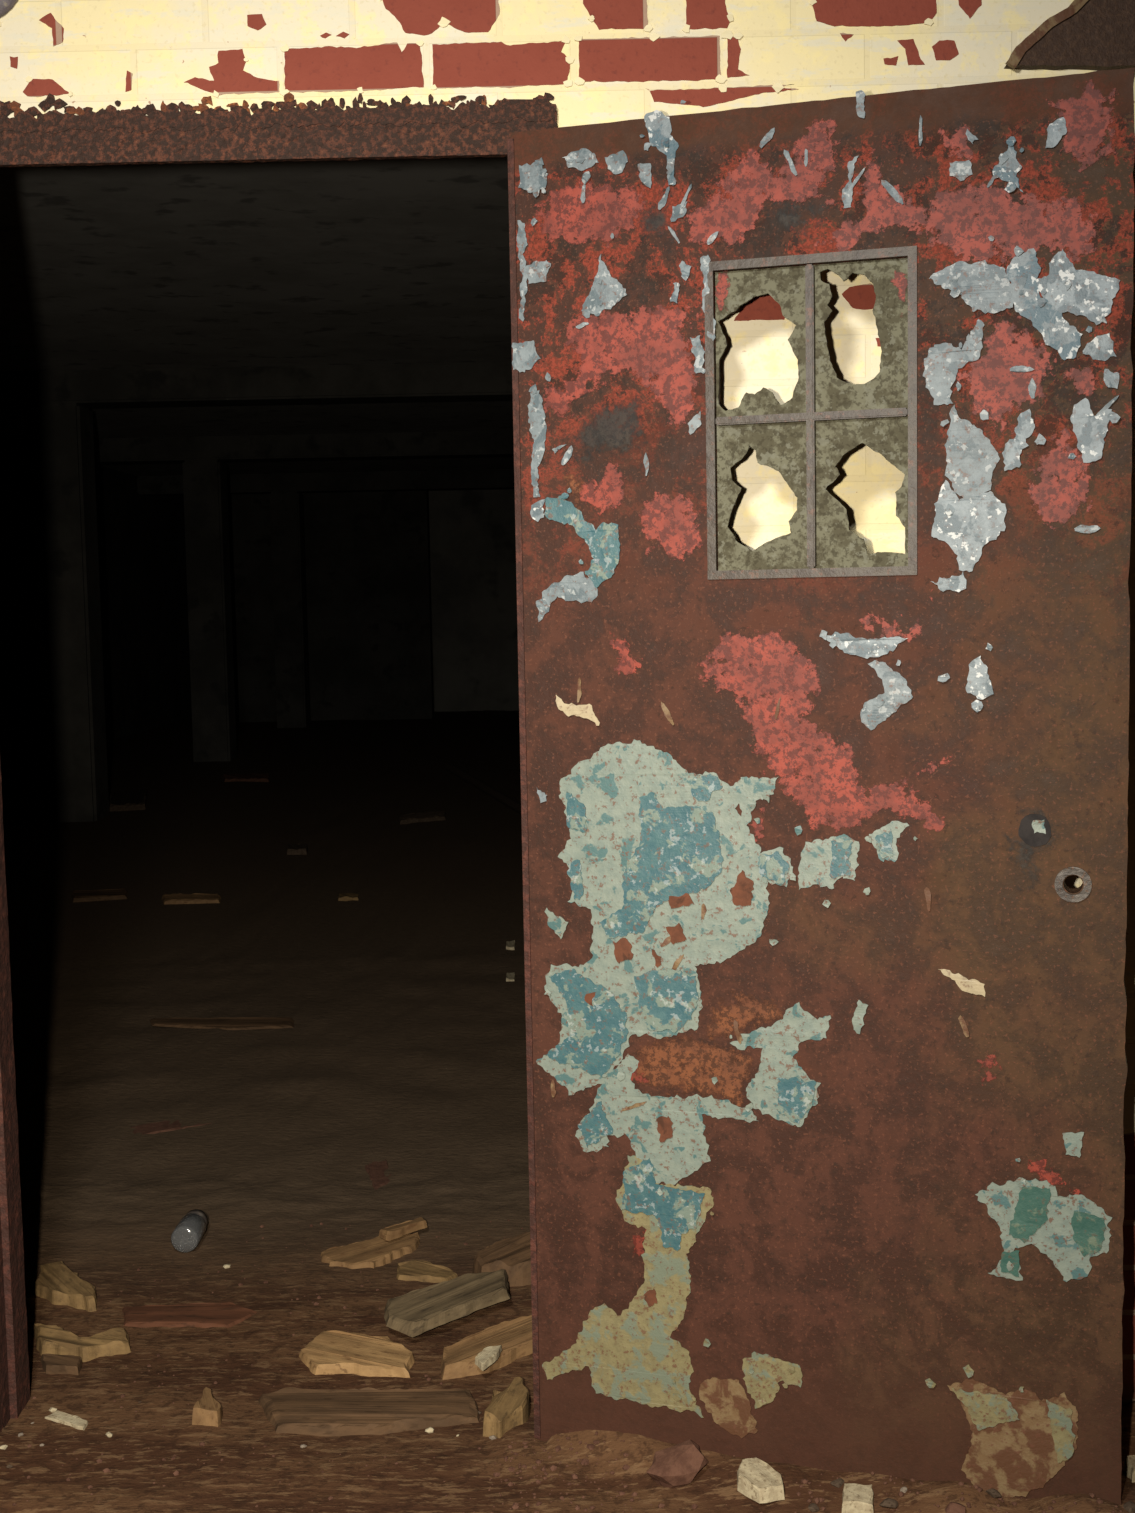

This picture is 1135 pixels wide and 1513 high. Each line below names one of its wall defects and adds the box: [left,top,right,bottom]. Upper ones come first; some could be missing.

peeling [809,0,959,66]
corrosion [0,92,507,117]
peeling [184,0,798,243]
peeling [576,255,627,329]
peeling [512,340,621,622]
peeling [923,246,1120,592]
peeling [820,630,913,730]
corrosion [634,994,783,1108]
peeling [536,739,918,1438]
peeling [975,1158,1112,1282]
spalling [737,1458,785,1503]
peeling [925,1364,1078,1498]